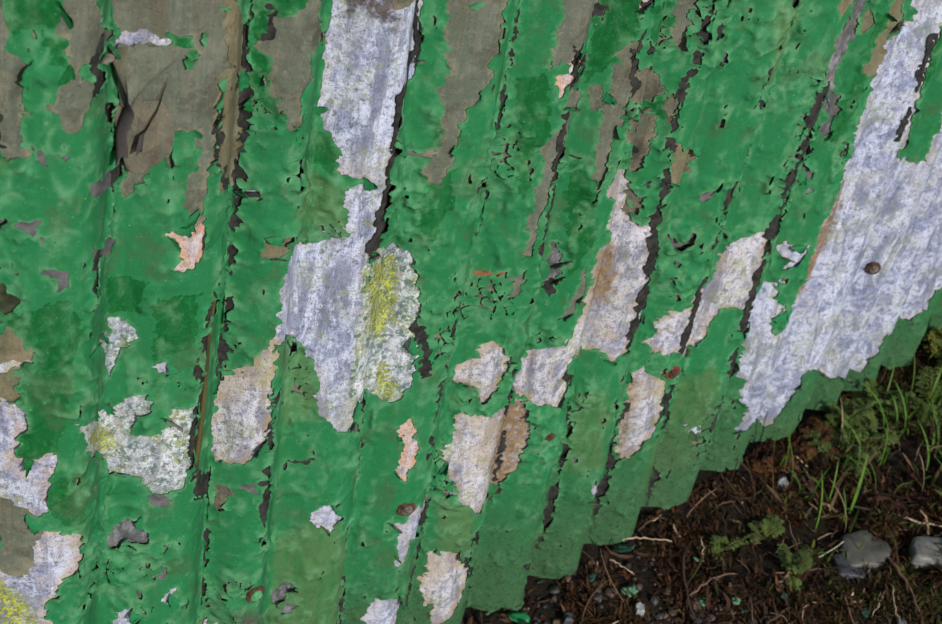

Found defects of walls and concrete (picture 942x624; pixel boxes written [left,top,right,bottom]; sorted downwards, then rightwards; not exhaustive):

peeling [0,0,69,166]
peeling [407,0,508,188]
peeling [0,219,44,243]
peeling [40,268,69,293]
peeling [46,0,432,464]
peeling [438,0,942,514]
peeling [0,320,85,624]
peeling [76,395,259,511]
peeling [394,418,419,482]
peeling [360,597,406,624]
peeling [387,500,429,567]
peeling [417,549,471,624]